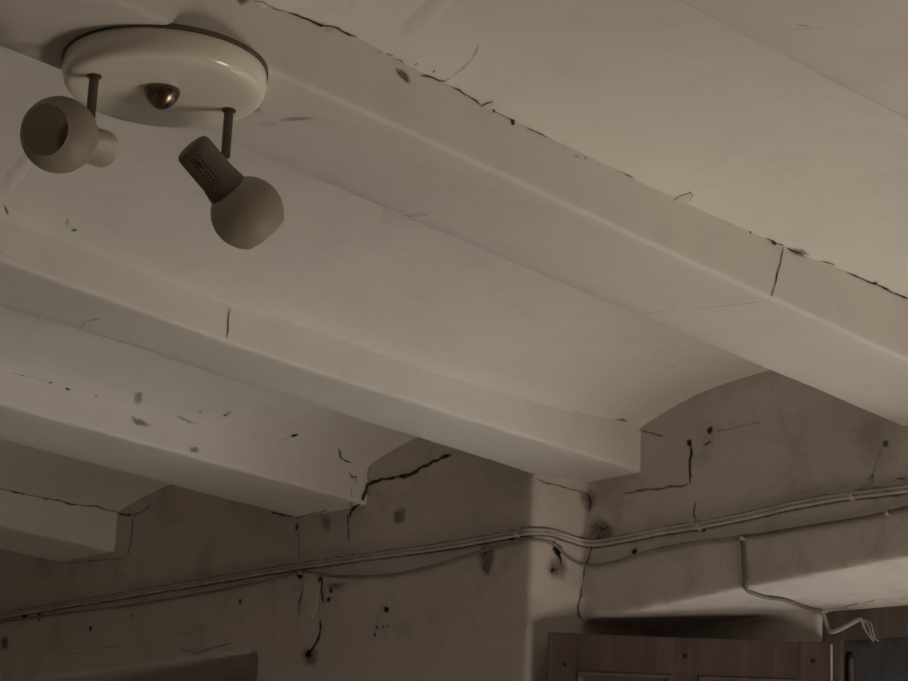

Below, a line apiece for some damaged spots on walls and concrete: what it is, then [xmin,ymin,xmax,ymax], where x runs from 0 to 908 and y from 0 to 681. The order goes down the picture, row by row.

crack [255,1,356,37]
crack [379,51,546,137]
crack [765,238,784,296]
crack [847,272,908,299]
crack [271,510,326,530]
crack [339,450,451,539]
crack [629,427,712,532]
crack [306,575,335,663]